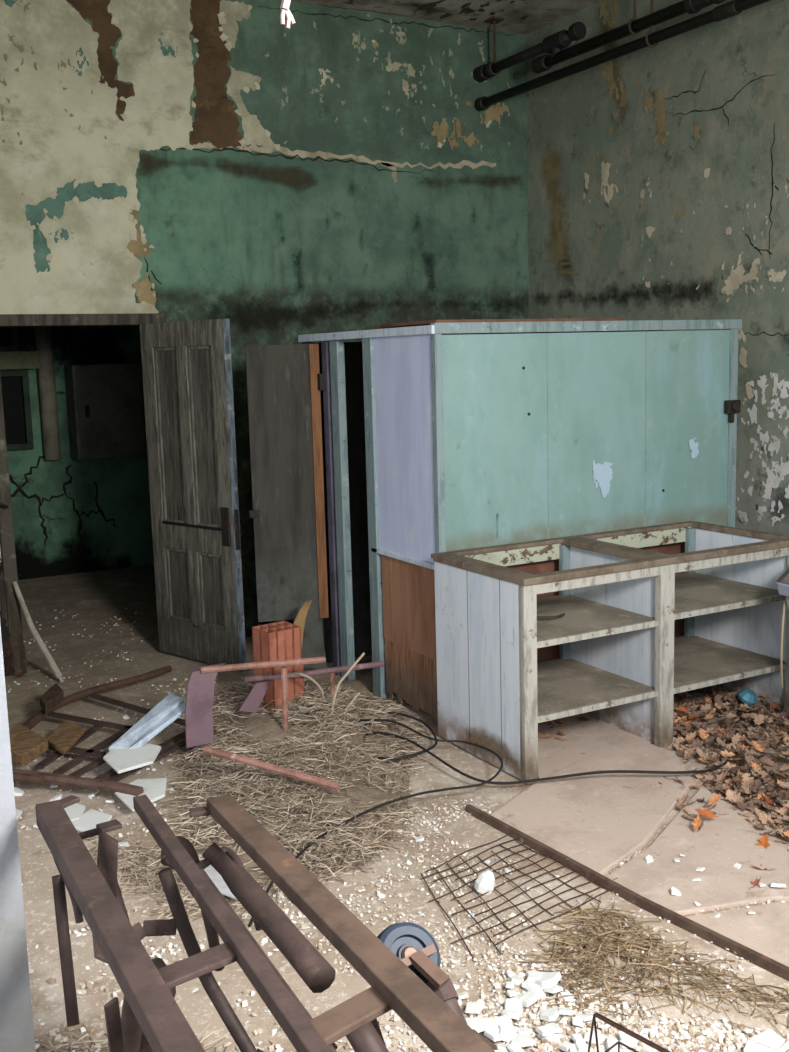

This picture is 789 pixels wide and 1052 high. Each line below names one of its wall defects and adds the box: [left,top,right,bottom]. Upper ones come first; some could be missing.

peeling [414,0,531,38]
peeling [310,68,340,103]
peeling [352,1,510,151]
crack [665,70,775,126]
peeling [0,0,287,314]
leakage [138,154,171,174]
leakage [217,161,314,189]
crack [745,123,789,256]
peeling [721,203,789,302]
leakage [213,302,375,331]
peeling [735,373,789,527]
crack [9,456,117,546]